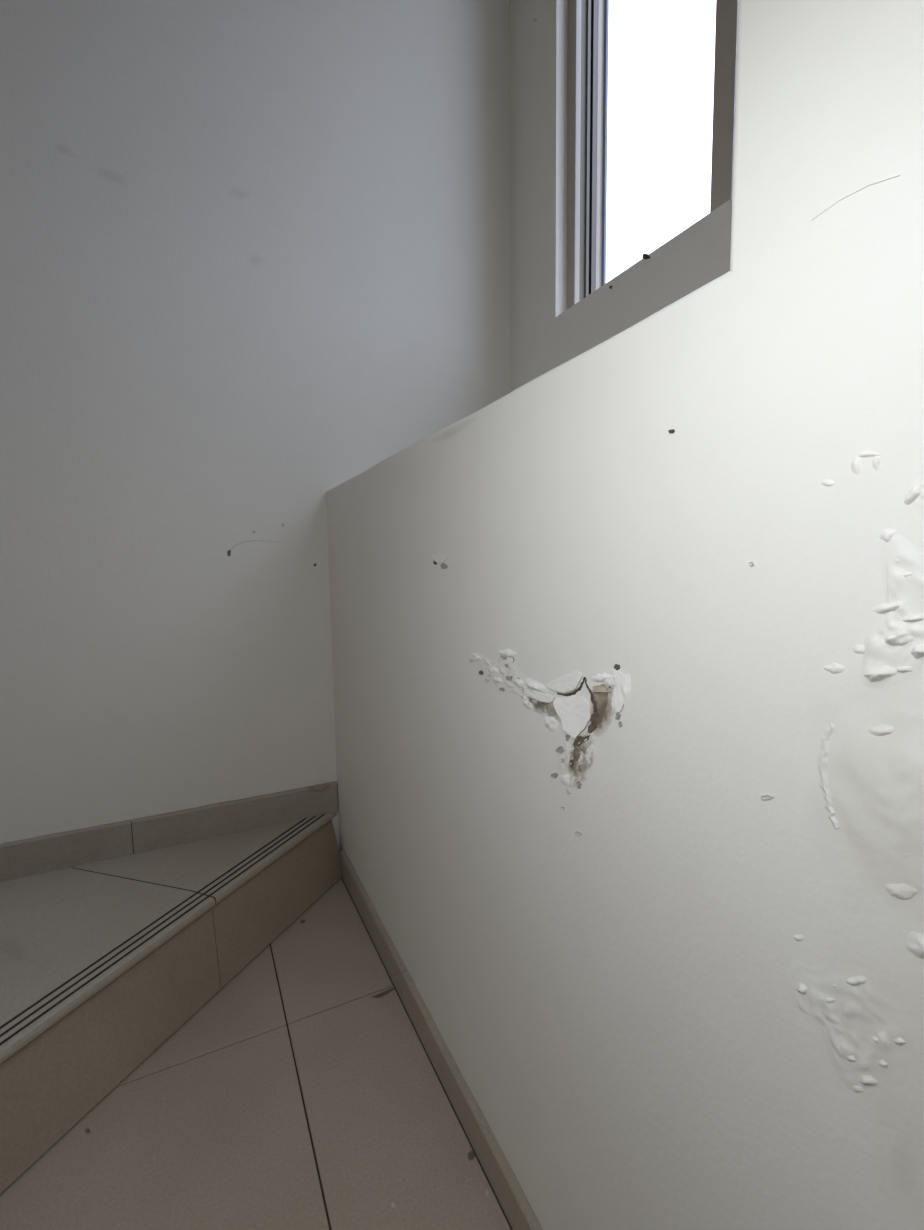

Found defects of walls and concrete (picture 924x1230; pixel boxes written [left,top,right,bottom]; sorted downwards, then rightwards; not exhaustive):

peeling [469,646,632,810]